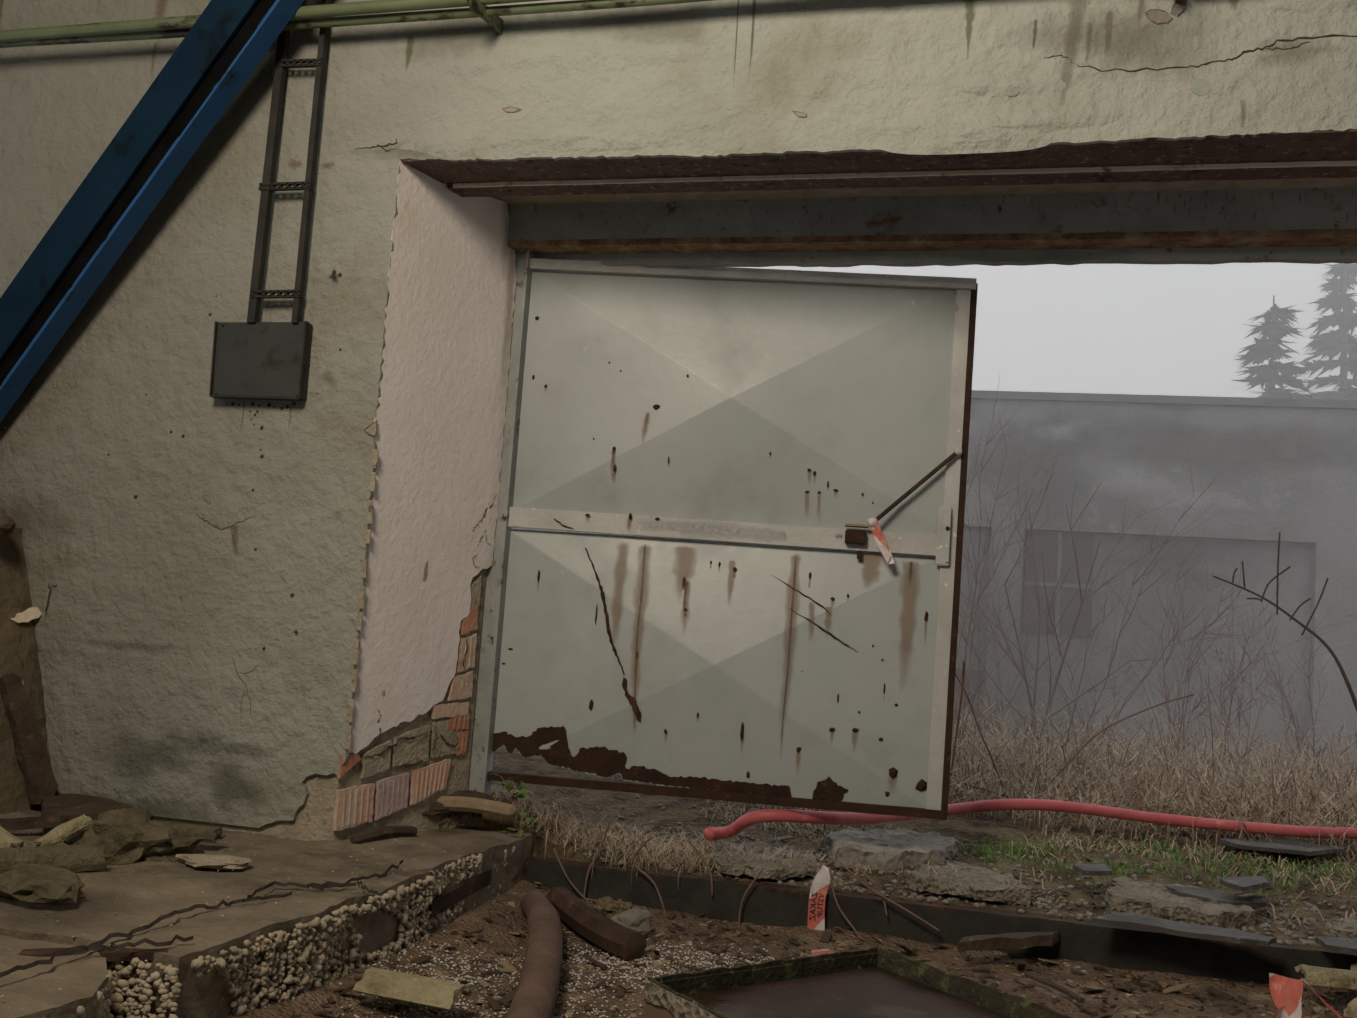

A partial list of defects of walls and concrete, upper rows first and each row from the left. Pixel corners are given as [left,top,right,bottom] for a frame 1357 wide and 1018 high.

crack [1046,34,1357,72]
flaking render [333,575,482,831]
crack [0,860,403,978]